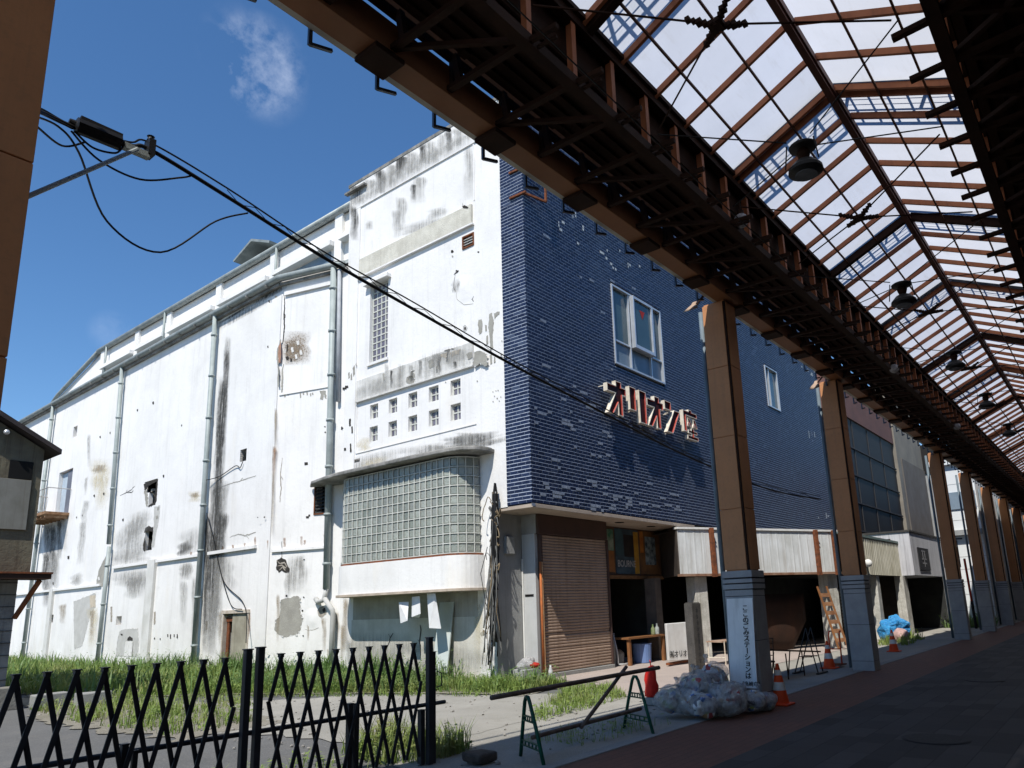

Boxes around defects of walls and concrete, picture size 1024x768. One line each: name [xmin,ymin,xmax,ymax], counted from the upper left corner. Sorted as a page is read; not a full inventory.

water stain [351,130,468,229]
flaking render [267,335,307,365]
water stain [421,433,491,453]
water stain [178,344,229,620]
spalling [276,542,290,573]
flaking render [73,557,109,650]
flaking render [110,607,139,658]
flaking render [274,595,304,637]